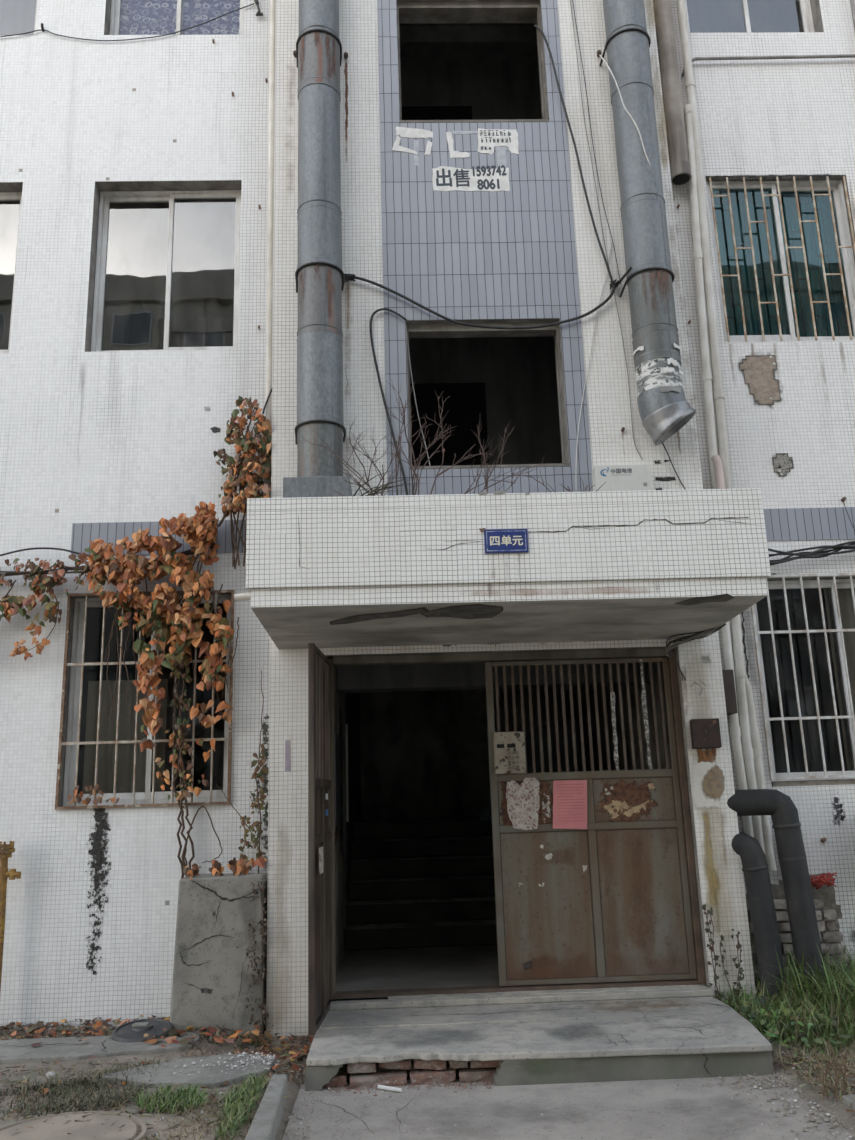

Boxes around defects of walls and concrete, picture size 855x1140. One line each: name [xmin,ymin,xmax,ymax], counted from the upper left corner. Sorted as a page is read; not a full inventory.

rust [300,31,348,159]
spalling [739,355,781,407]
spalling [772,453,794,477]
crack [529,517,761,533]
flaking render [692,761,725,808]
crack [179,880,259,1014]
crack [607,1003,734,1075]